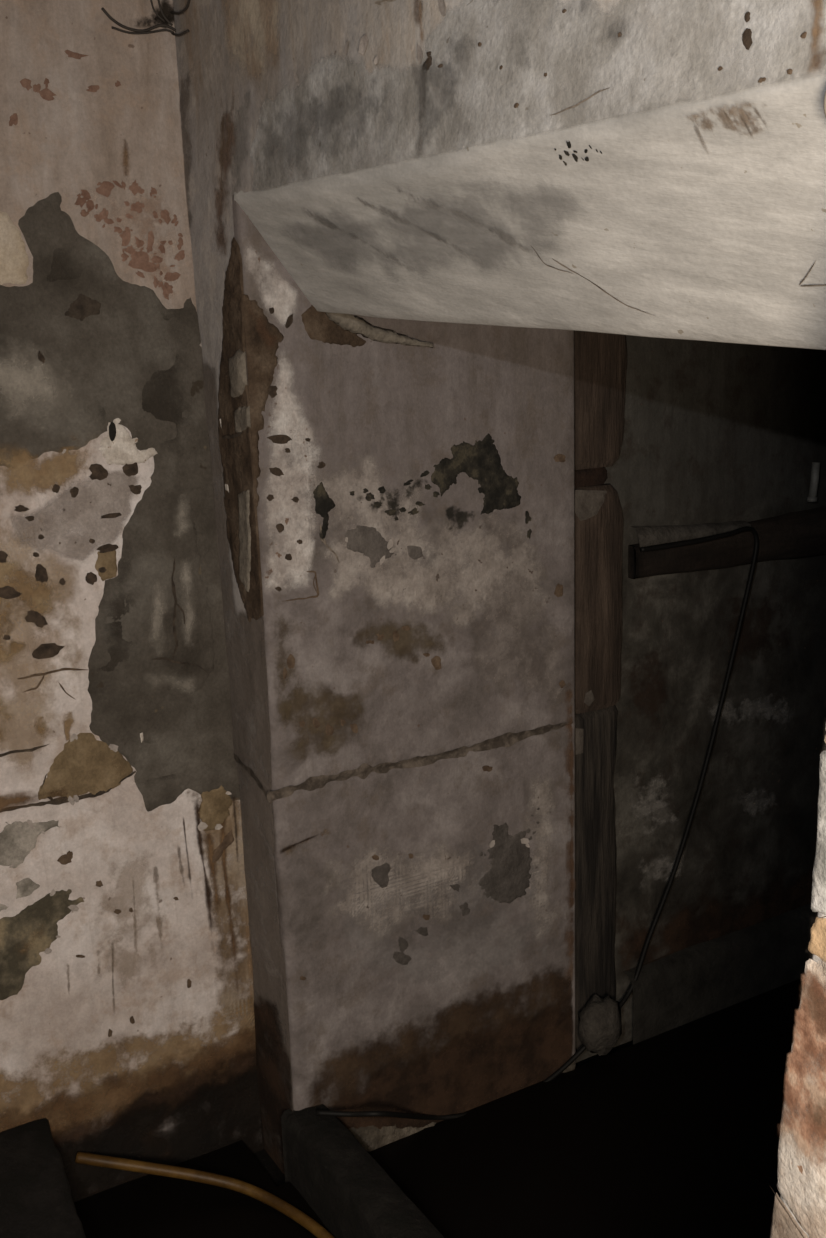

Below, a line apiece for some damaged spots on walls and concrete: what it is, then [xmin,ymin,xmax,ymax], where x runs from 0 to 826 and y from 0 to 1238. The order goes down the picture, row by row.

spalling [0,180,563,1000]
leakage [0,365,363,1202]
crack [234,722,573,803]
spalling [808,917,826,962]
leakage [310,972,573,1129]